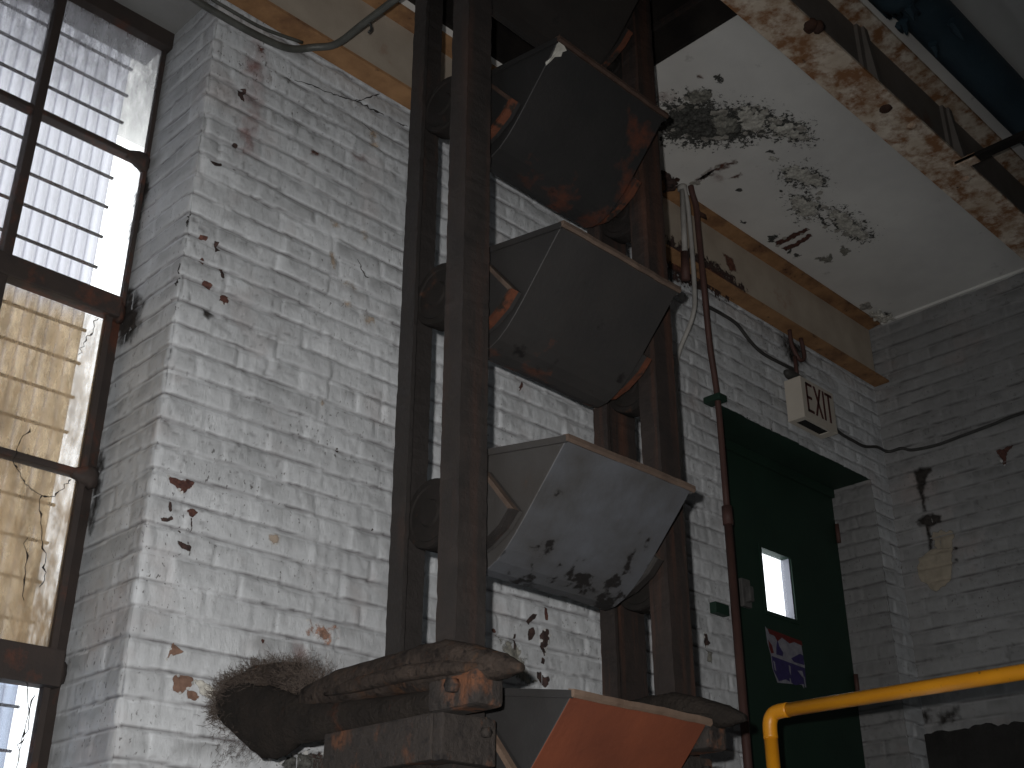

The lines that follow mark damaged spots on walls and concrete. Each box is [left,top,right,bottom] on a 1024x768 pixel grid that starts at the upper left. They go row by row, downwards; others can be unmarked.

crack [284,77,408,136]
rust [767,228,812,254]
peeling [202,269,230,305]
peeling [161,475,198,552]
spalling [165,643,183,661]
peeling [492,607,551,687]
spalling [173,674,215,701]